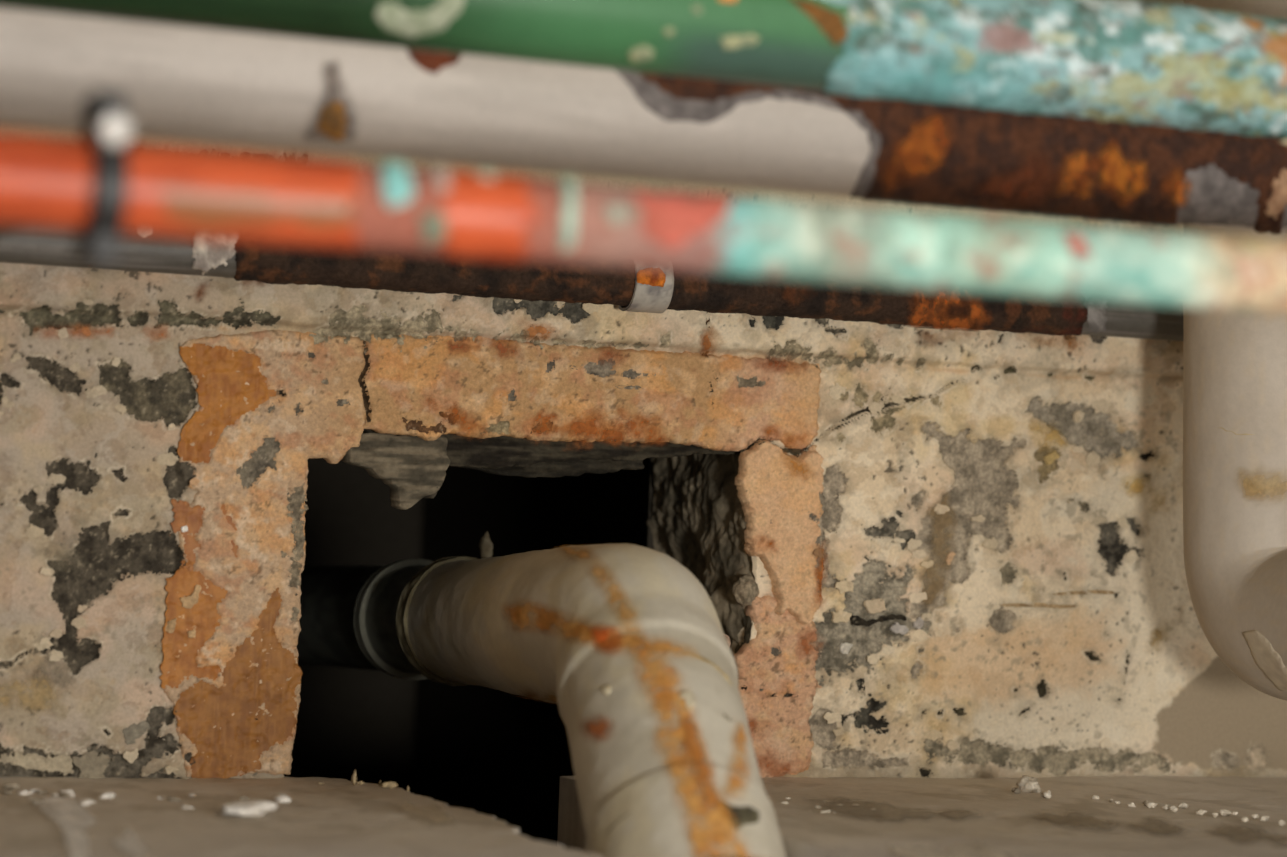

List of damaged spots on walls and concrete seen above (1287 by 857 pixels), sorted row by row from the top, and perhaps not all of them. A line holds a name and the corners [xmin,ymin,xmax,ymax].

corrosion [638,72,1287,234]
peeling [20,453,128,540]
peeling [0,352,200,499]
peeling [0,298,281,339]
peeling [235,435,282,490]
crack [358,340,372,424]
peeling [306,297,671,390]
flaking render [342,412,747,510]
peeling [33,509,186,675]
peeling [281,483,309,621]
peeling [749,316,1176,778]
peeling [0,706,195,779]